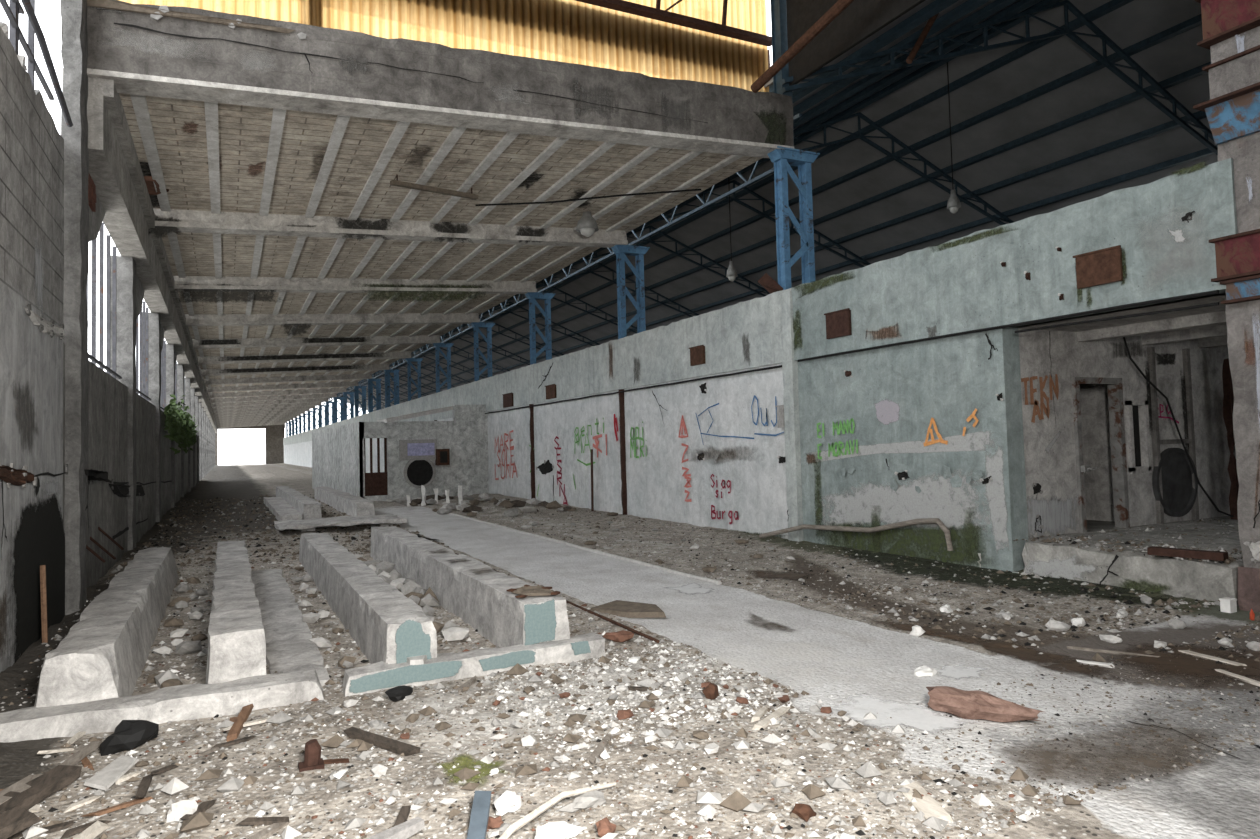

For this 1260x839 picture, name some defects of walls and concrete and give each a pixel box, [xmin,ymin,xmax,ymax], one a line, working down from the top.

crack [34,472,172,539]
leakage [872,514,880,549]
peeling [809,431,1009,551]